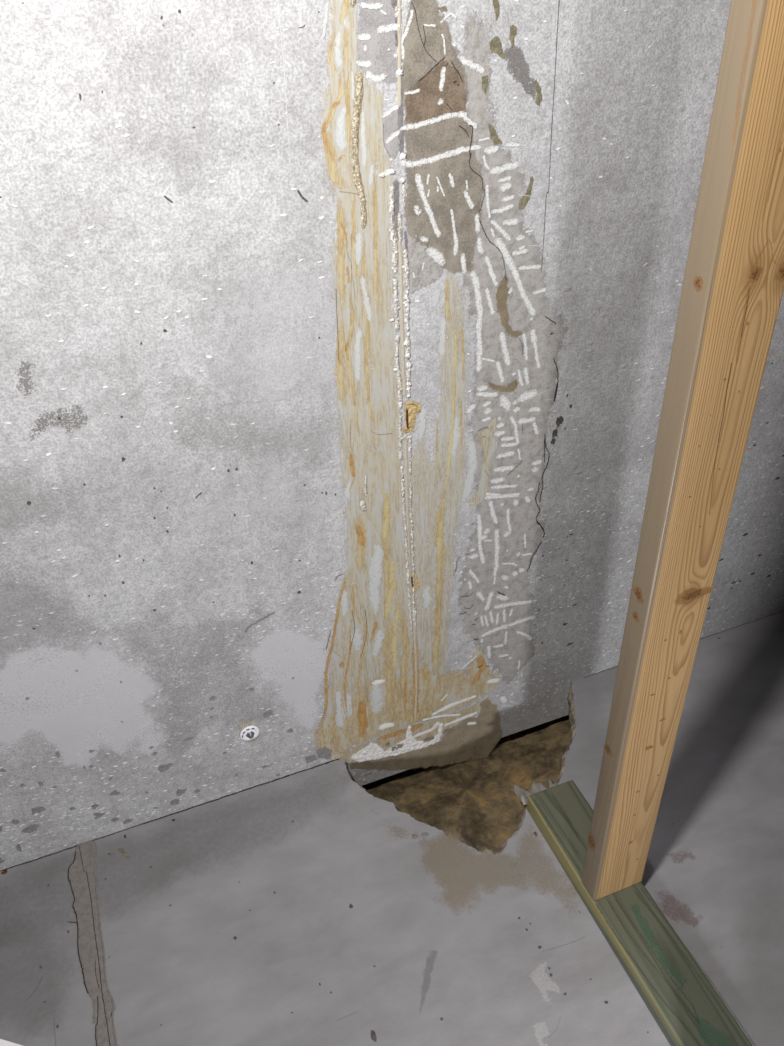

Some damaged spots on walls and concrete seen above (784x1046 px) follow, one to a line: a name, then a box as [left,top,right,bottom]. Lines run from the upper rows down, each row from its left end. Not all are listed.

crack [411,1,507,279]
rust [314,0,499,763]
spalling [403,401,421,433]
crack [545,316,558,401]
spalling [551,394,572,444]
crack [522,429,550,571]
damp [0,645,165,774]
damp [247,628,334,731]
crack [1,759,339,1046]